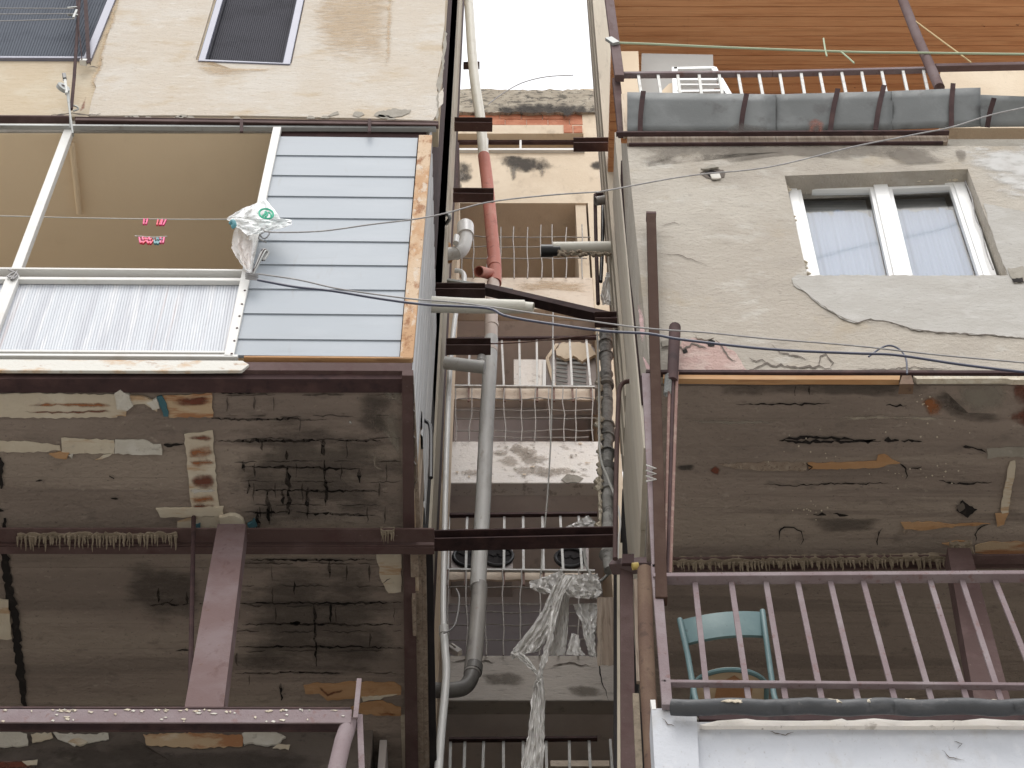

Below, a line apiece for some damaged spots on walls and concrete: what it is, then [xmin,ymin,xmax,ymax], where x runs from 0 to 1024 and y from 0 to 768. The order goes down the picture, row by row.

damp [504,156,546,179]
spalling [1008,266,1024,284]
crack [736,347,834,406]
peeling [0,390,257,528]
peeling [720,435,959,484]
crack [764,436,991,487]
crack [0,457,8,528]
peeling [901,447,1024,554]
damp [16,535,177,552]
crack [1,554,27,706]
crack [235,558,403,701]
peeling [303,681,401,717]